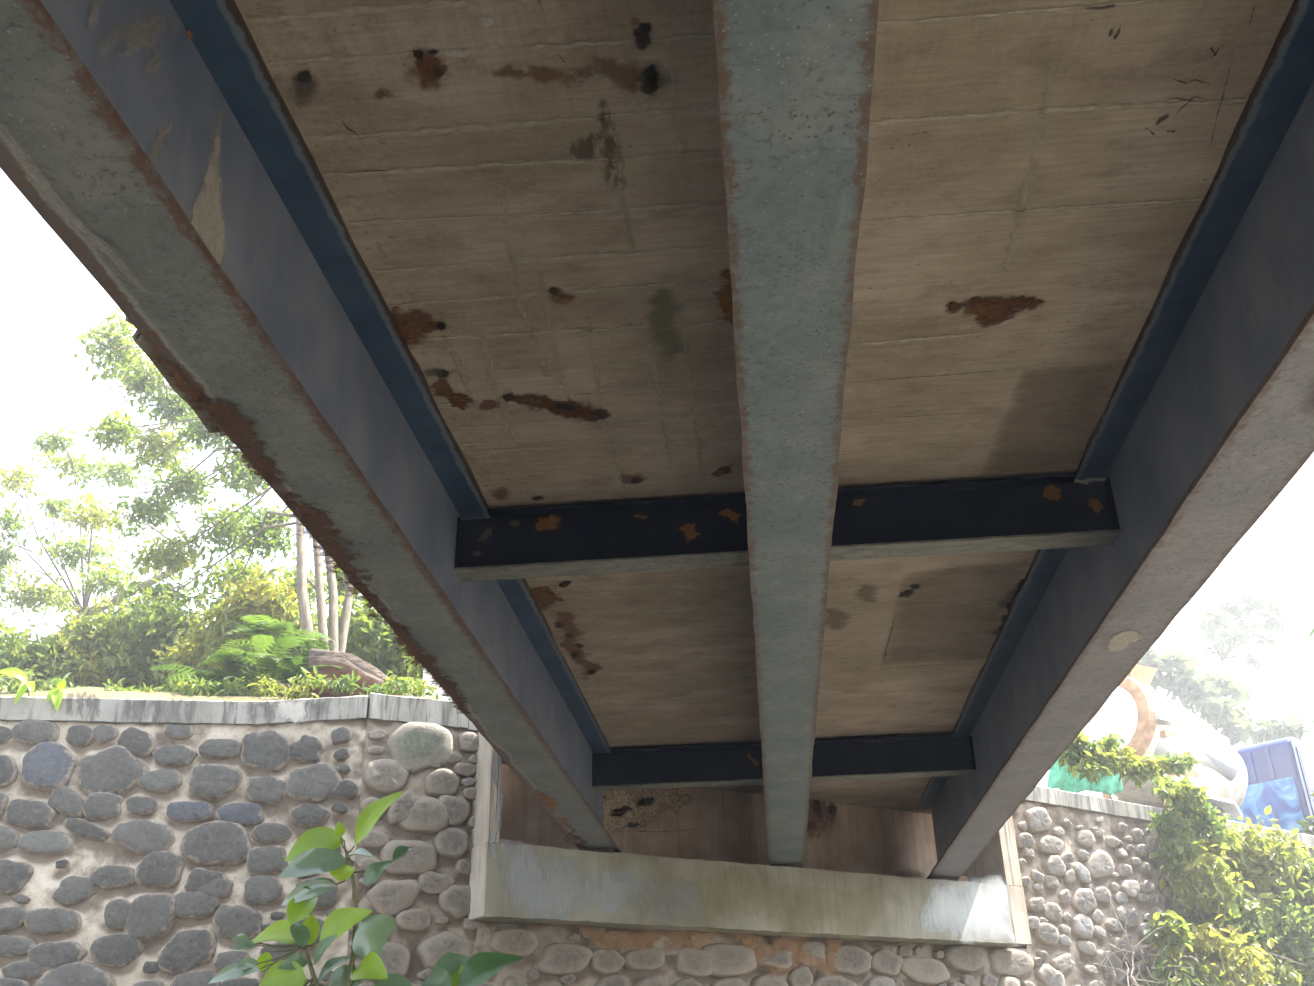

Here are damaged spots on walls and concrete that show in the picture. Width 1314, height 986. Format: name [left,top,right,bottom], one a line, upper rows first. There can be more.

corrosion [413,50,445,88]
corrosion [494,59,642,92]
corrosion [713,269,733,325]
corrosion [392,306,447,345]
corrosion [153,356,472,714]
corrosion [536,514,562,531]
corrosion [530,581,571,609]